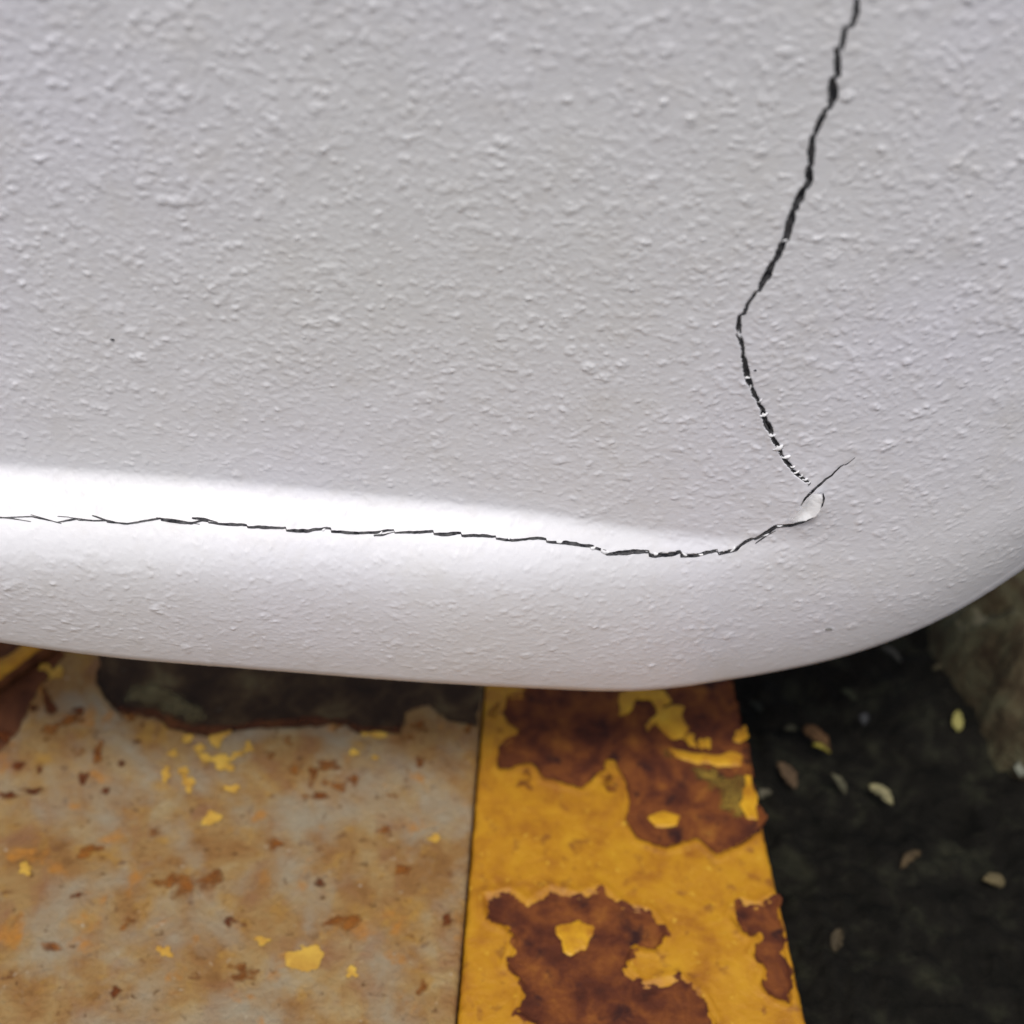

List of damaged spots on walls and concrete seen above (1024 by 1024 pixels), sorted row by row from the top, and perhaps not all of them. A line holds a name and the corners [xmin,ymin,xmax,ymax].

crack [0,0,860,558]
corrosion [0,651,85,750]
corrosion [0,787,42,798]
corrosion [72,731,103,785]
corrosion [291,761,359,799]
peeling [497,679,767,854]
corrosion [78,845,104,858]
corrosion [153,870,223,894]
corrosion [228,964,259,981]
corrosion [323,915,361,930]
peeling [486,885,712,1024]
peeling [734,894,793,1003]